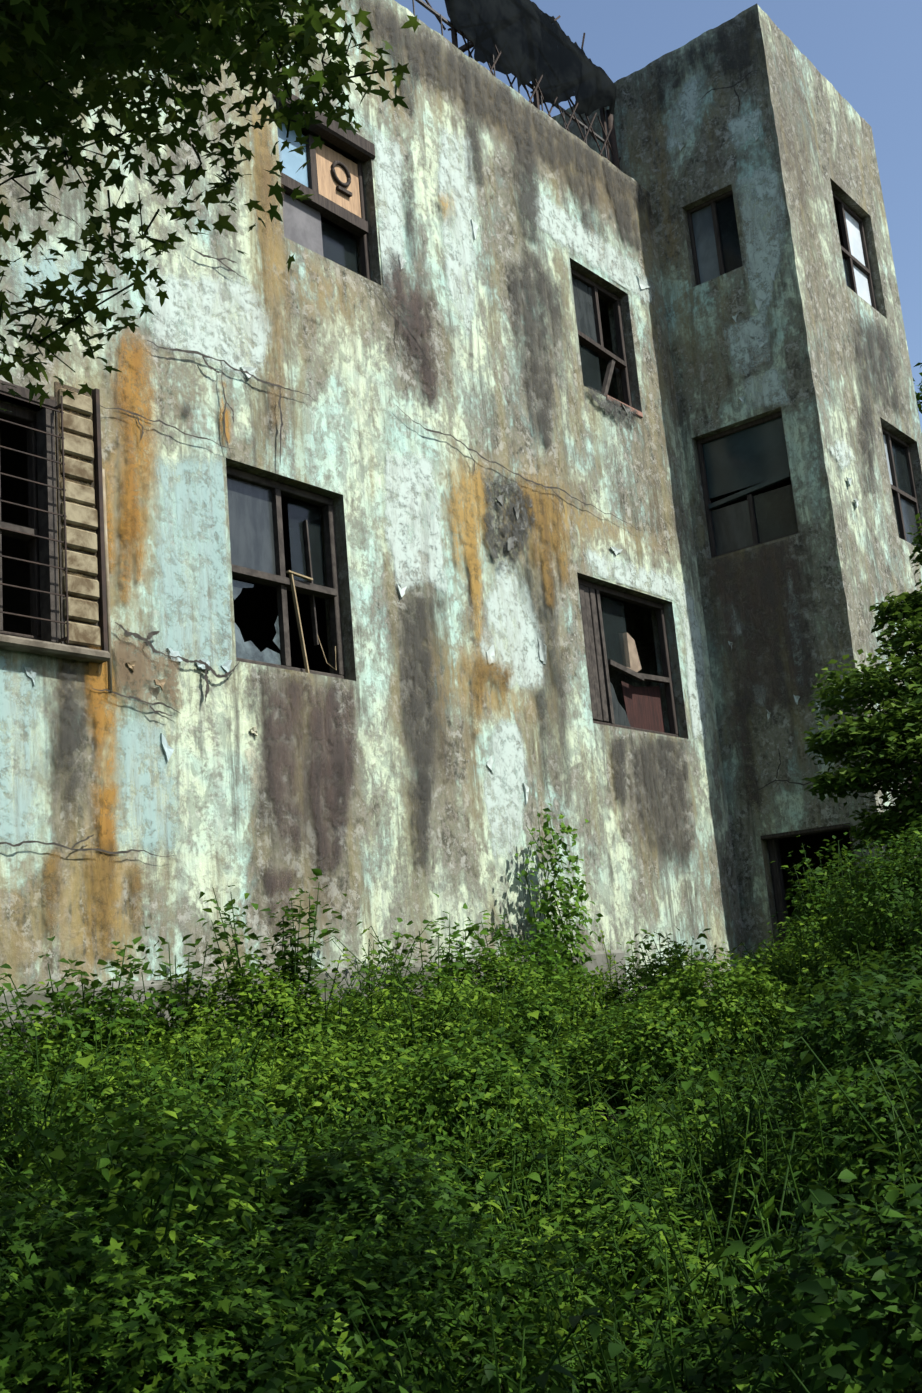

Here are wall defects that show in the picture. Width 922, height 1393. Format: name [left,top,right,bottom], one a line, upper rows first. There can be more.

water stain [361,0,651,447]
corrosion [107,334,153,600]
crack [100,340,317,464]
corrosion [451,468,488,637]
corrosion [510,476,569,606]
crack [0,834,174,857]
corrosion [87,662,143,960]
crack [91,622,240,716]
water stain [255,673,354,870]
water stain [402,595,441,865]
water stain [612,736,691,864]